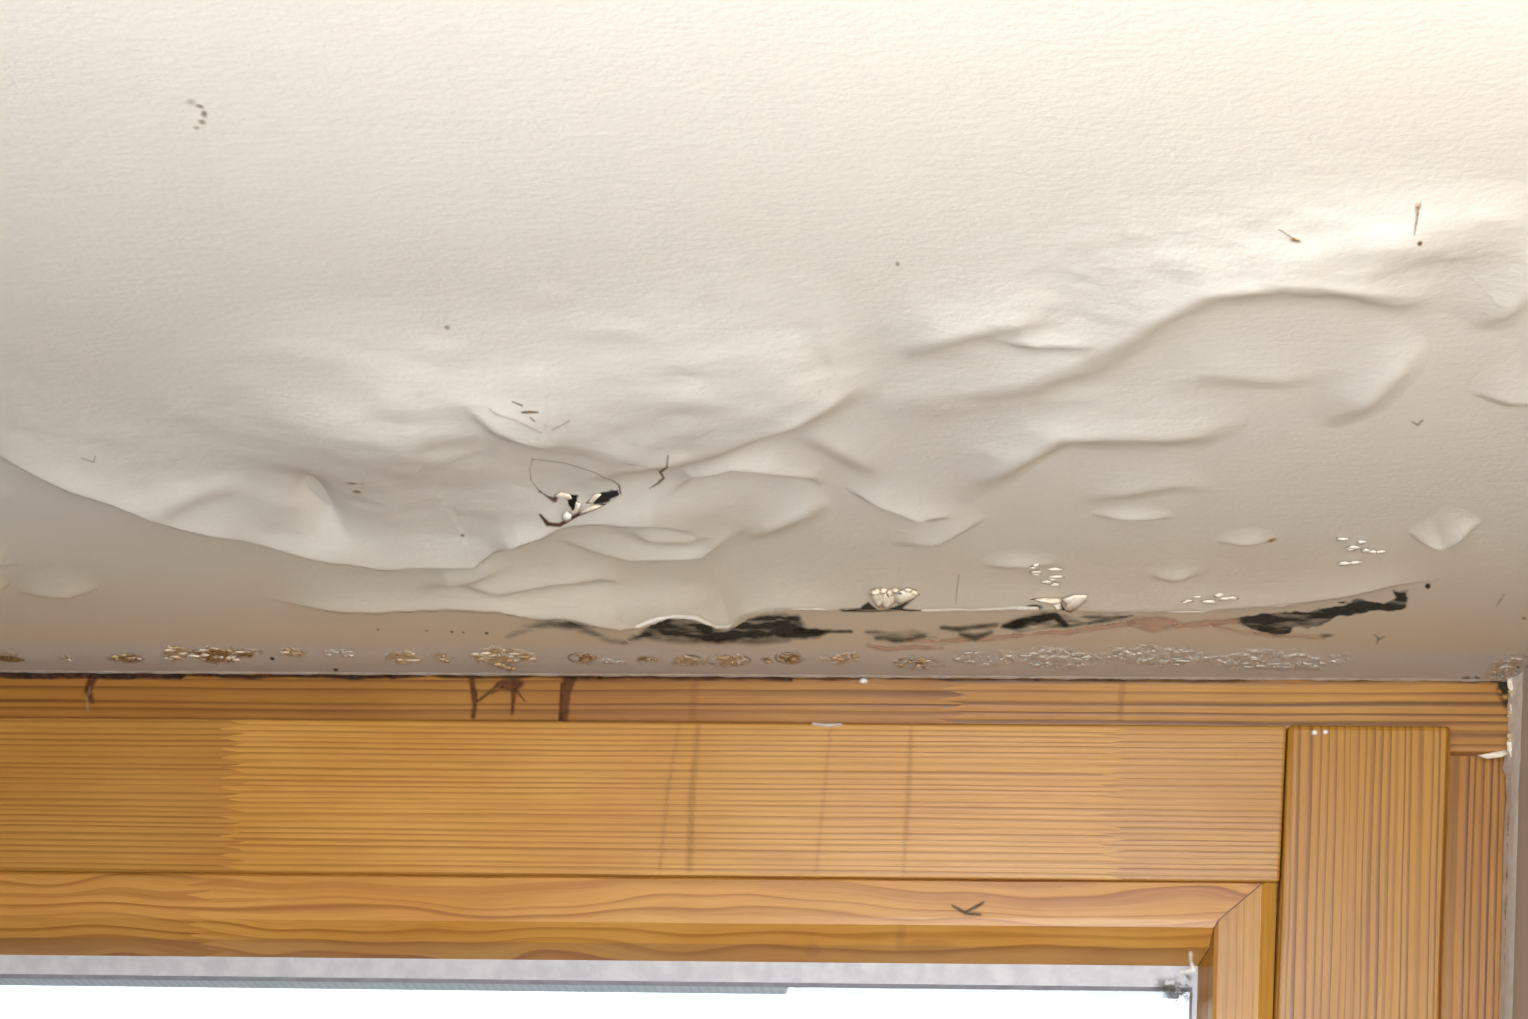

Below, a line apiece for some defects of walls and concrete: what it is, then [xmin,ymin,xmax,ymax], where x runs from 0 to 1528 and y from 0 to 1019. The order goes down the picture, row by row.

spalling [568,488,620,510]
peeling [255,537,1439,674]